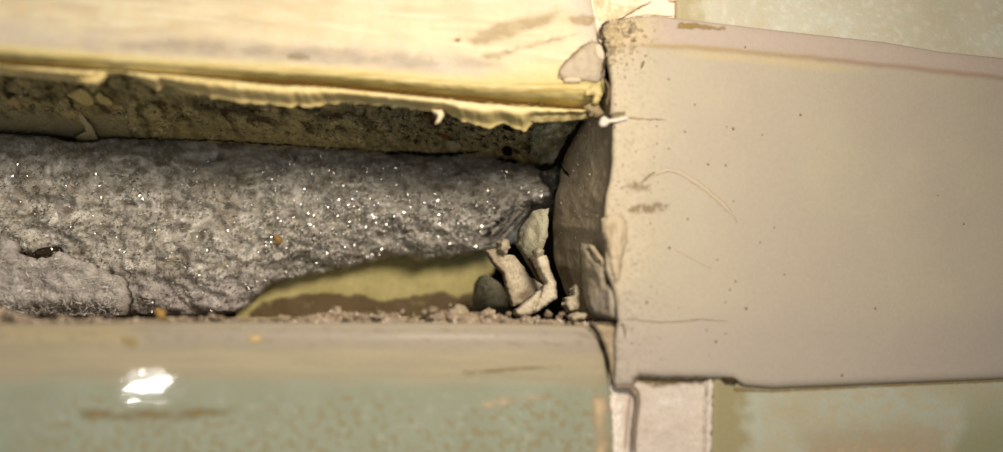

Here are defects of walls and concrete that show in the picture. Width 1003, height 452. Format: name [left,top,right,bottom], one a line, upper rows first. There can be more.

peeling [0,63,604,166]